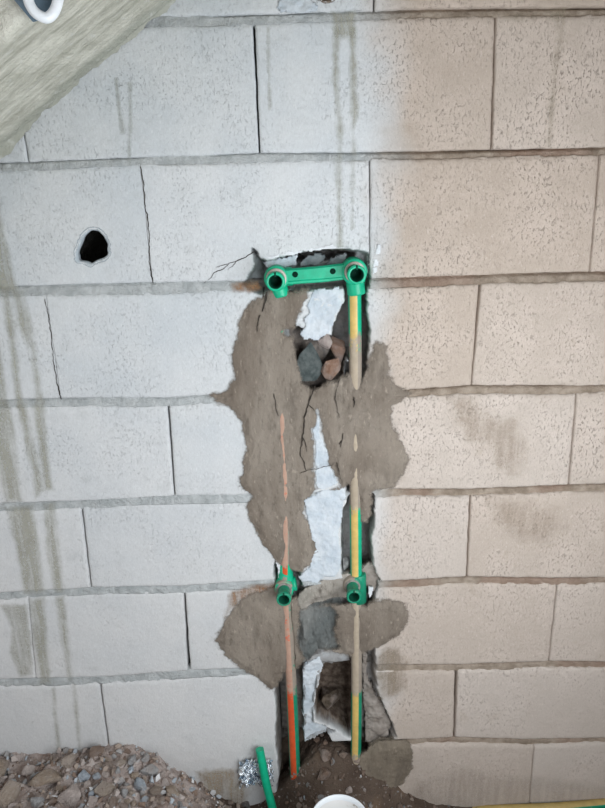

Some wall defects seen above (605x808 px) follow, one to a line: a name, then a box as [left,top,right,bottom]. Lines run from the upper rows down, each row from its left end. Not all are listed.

crack [140,167,153,281]
crack [45,302,62,400]
crack [300,386,341,479]
leakage [14,509,39,591]